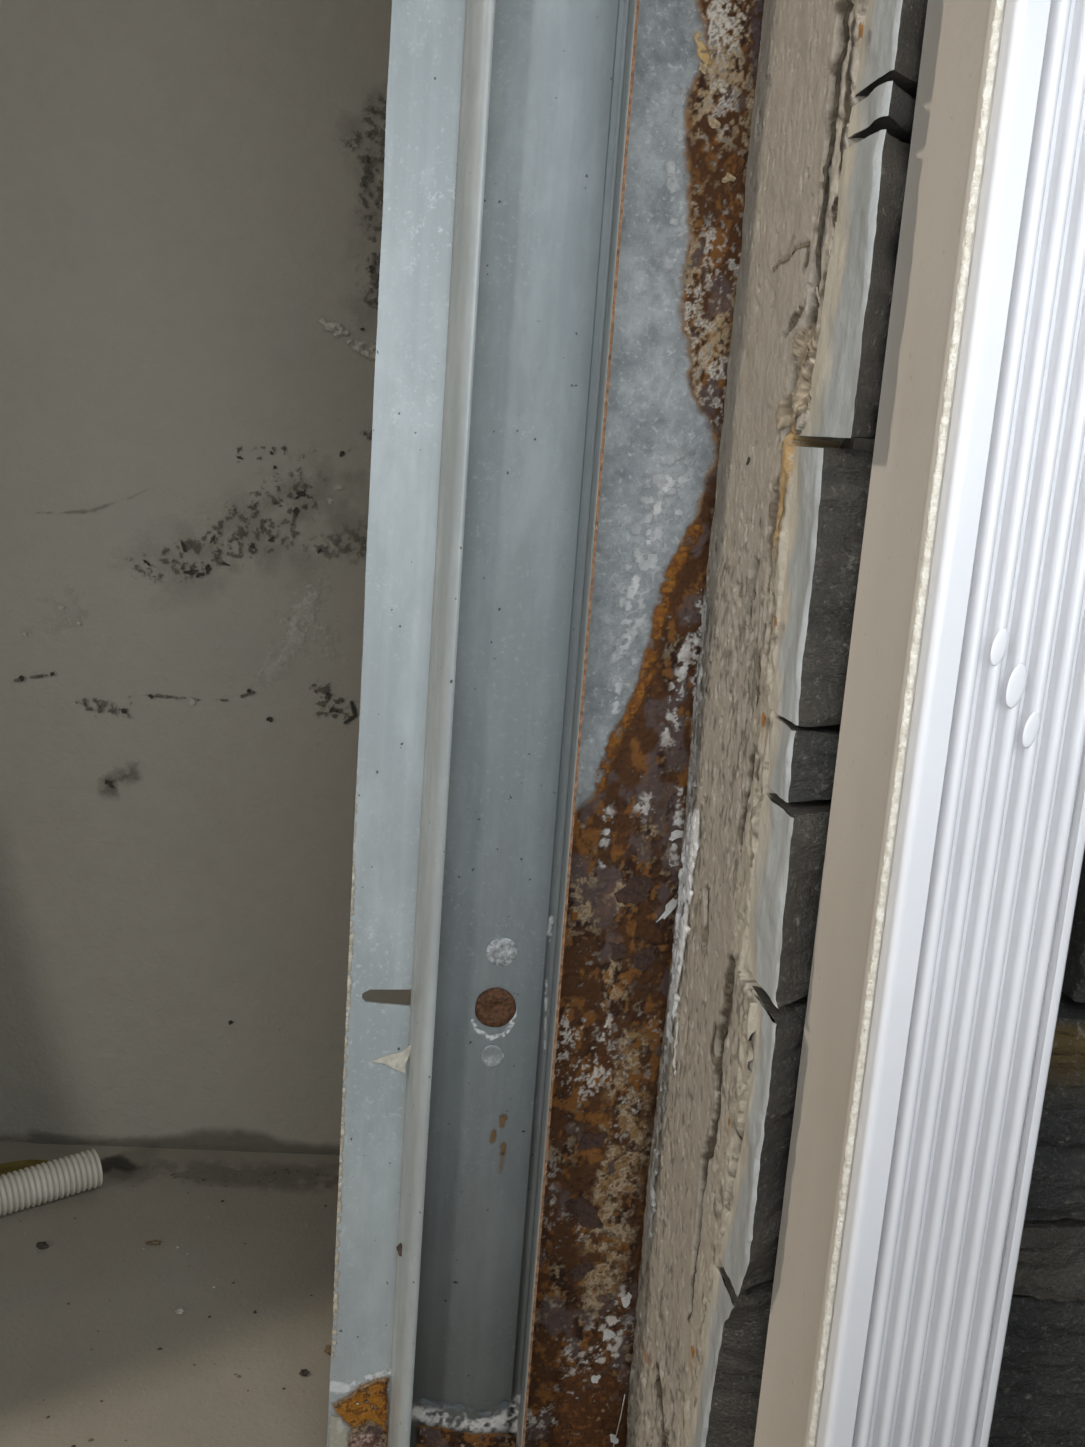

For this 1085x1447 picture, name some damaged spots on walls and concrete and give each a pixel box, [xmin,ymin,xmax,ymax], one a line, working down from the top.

mould [347,96,387,308]
mould [135,446,342,579]
mould [317,535,367,555]
corrosion [411,0,764,1447]
corrosion [328,1369,391,1447]